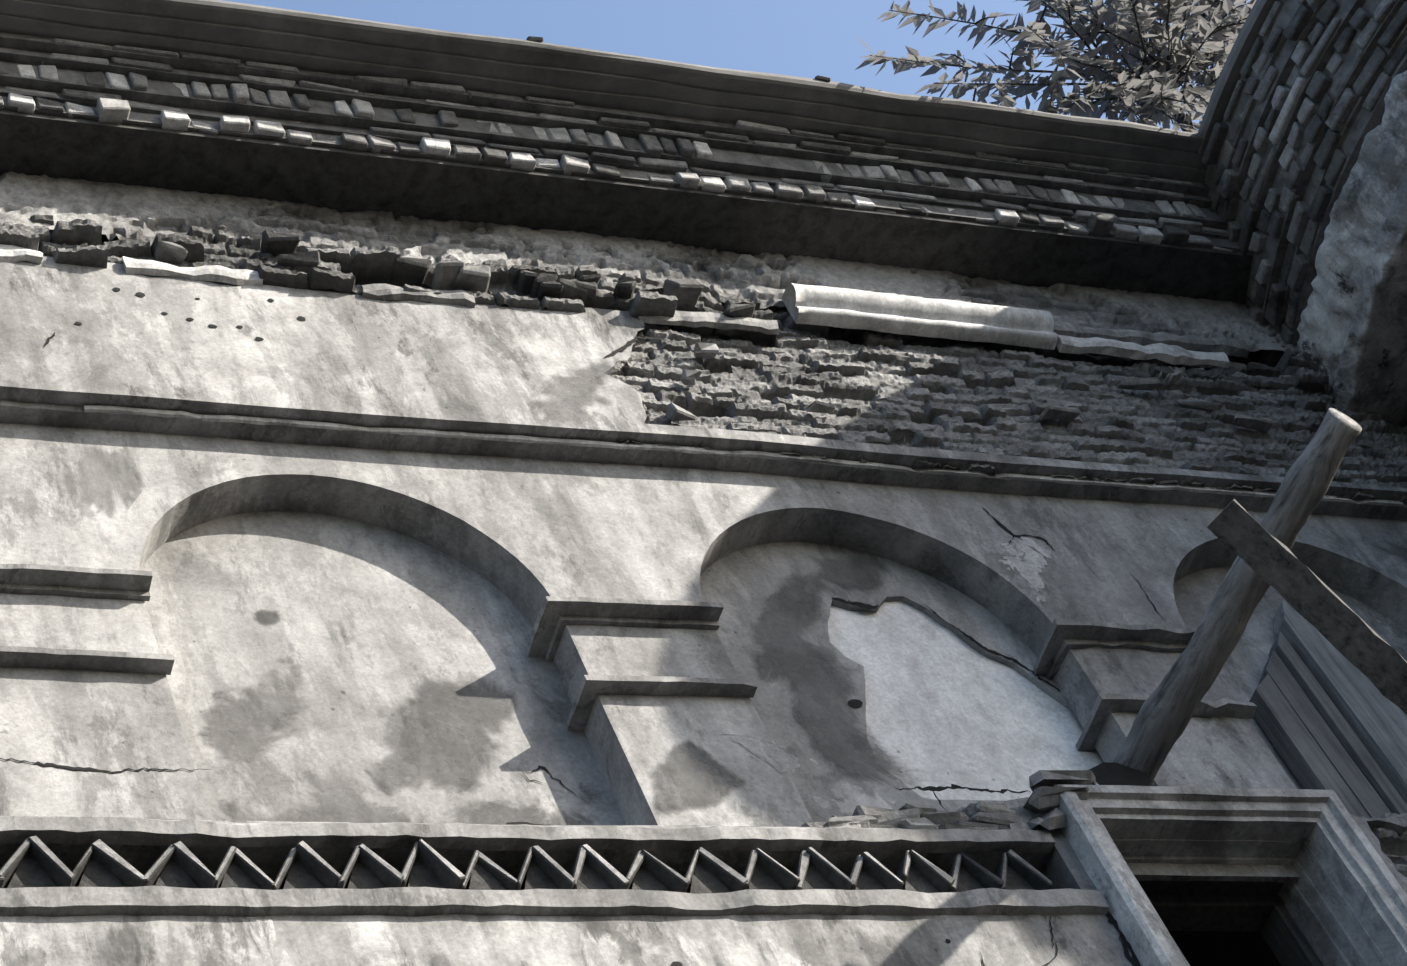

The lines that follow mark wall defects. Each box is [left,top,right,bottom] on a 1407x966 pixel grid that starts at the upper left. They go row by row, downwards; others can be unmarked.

flaking render [607,322,1407,502]
crack [983,508,1054,550]
damp [756,558,902,780]
crack [0,758,211,773]
damp [203,684,300,759]
damp [221,681,514,823]
damp [453,802,591,825]
crack [896,784,1031,811]
flaking render [1357,813,1407,878]